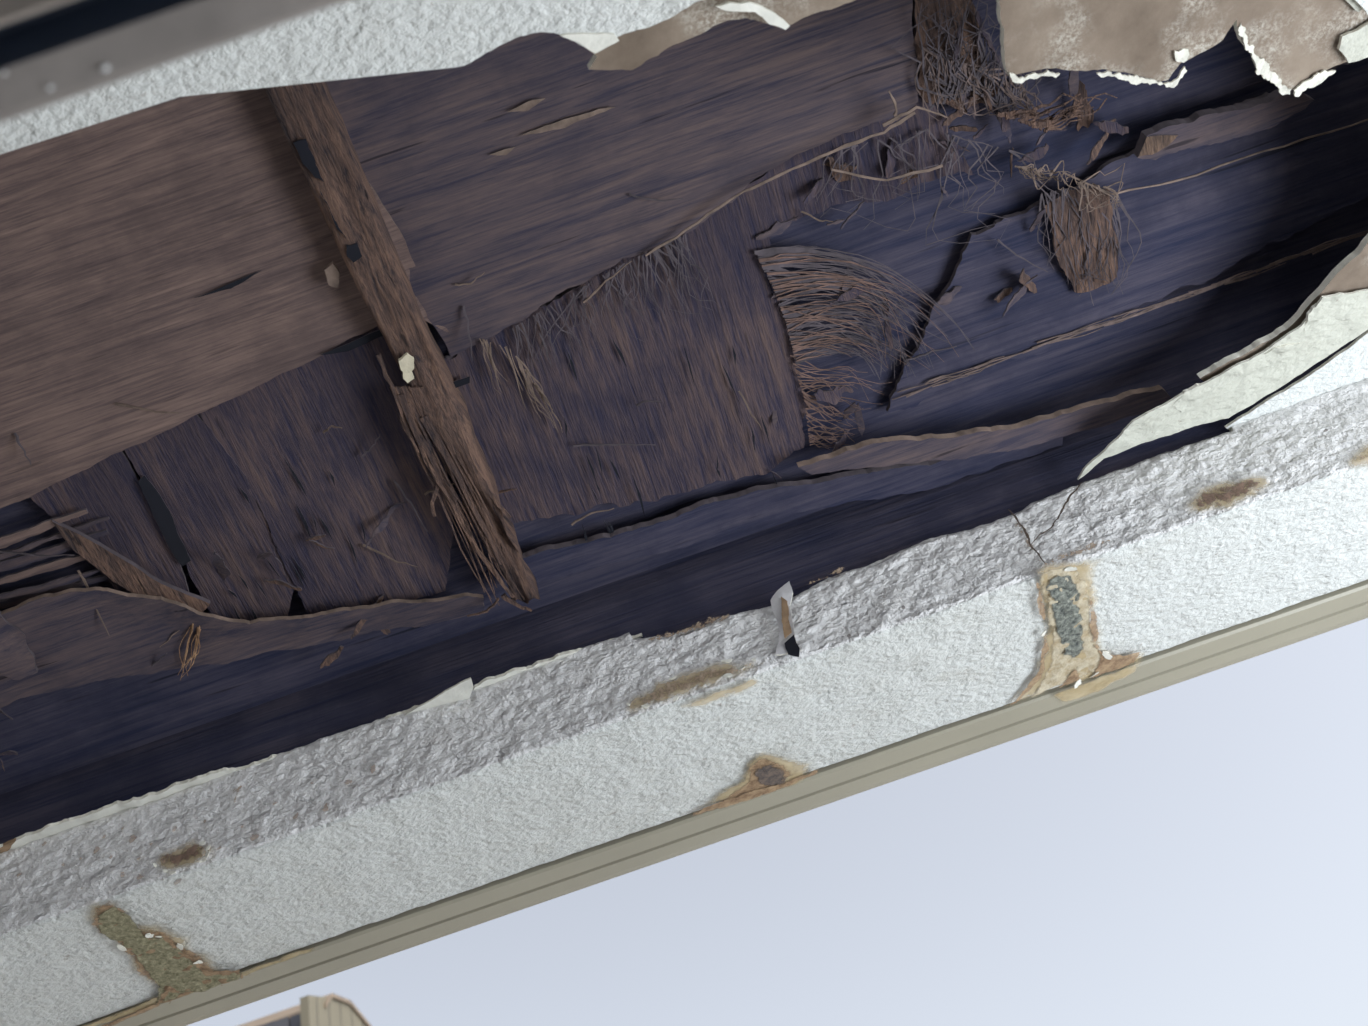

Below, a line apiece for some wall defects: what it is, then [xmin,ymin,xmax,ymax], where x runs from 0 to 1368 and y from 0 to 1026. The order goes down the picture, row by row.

peeling [560,32,619,54]
peeling [715,1,790,30]
peeling [1077,289,1368,480]
crack [1008,482,1110,565]
spalling [632,614,729,651]
peeling [770,582,800,657]
peeling [385,648,582,719]
peeling [0,752,291,853]
corrosion [693,755,818,815]